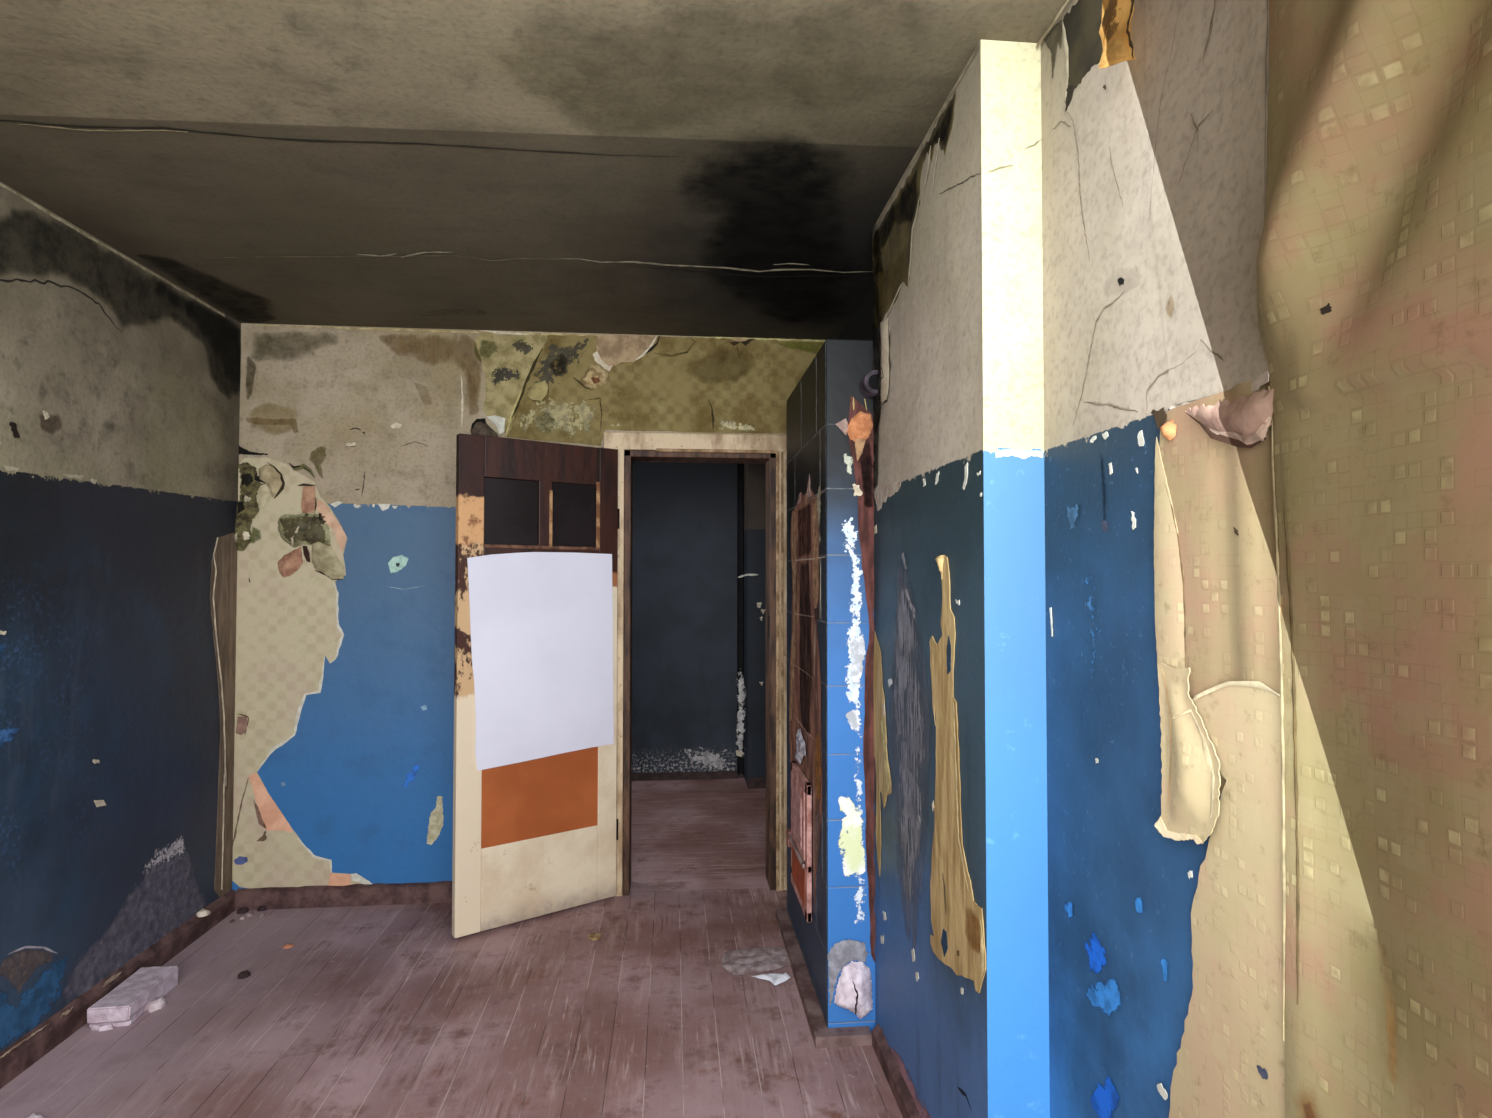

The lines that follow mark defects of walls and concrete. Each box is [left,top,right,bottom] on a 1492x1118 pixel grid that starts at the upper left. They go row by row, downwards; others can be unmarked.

peeling [1044,0,1135,112]
crack [0,120,679,157]
crack [941,0,1217,261]
crack [0,183,225,317]
damp [0,211,329,397]
crack [263,325,609,336]
damp [385,330,548,436]
crack [1073,292,1224,424]
peeling [1137,388,1274,448]
flaking render [580,90,956,1019]
peeling [210,458,397,897]
peeling [1154,663,1285,1118]